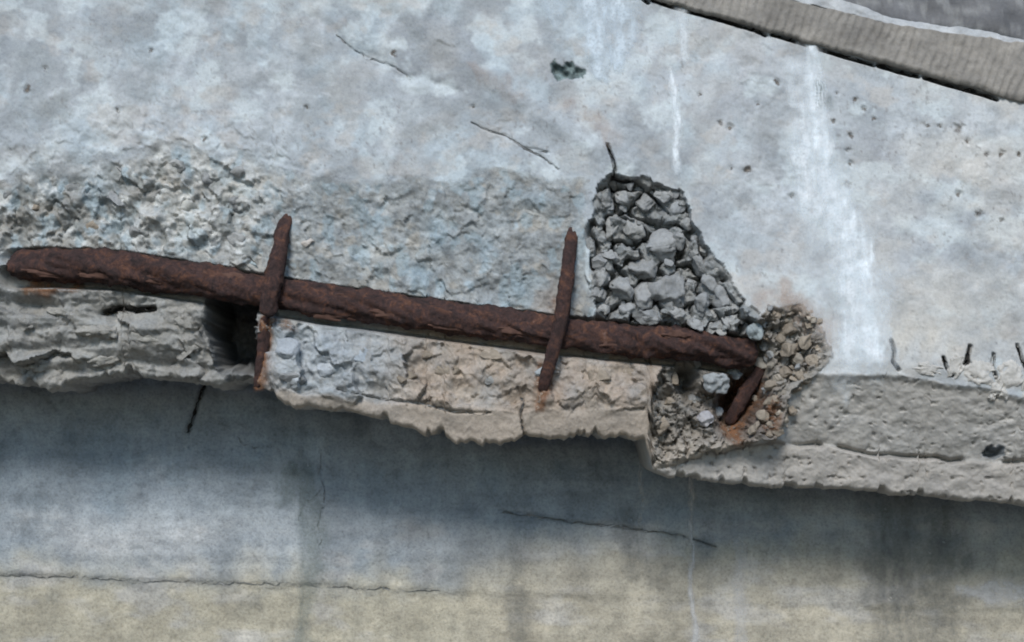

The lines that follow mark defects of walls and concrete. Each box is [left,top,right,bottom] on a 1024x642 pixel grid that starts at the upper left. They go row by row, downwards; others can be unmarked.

water stain [791,44,885,364]
spalling [0,137,834,471]
crack [186,385,206,433]
corrosion [725,380,760,443]
crack [503,511,717,547]